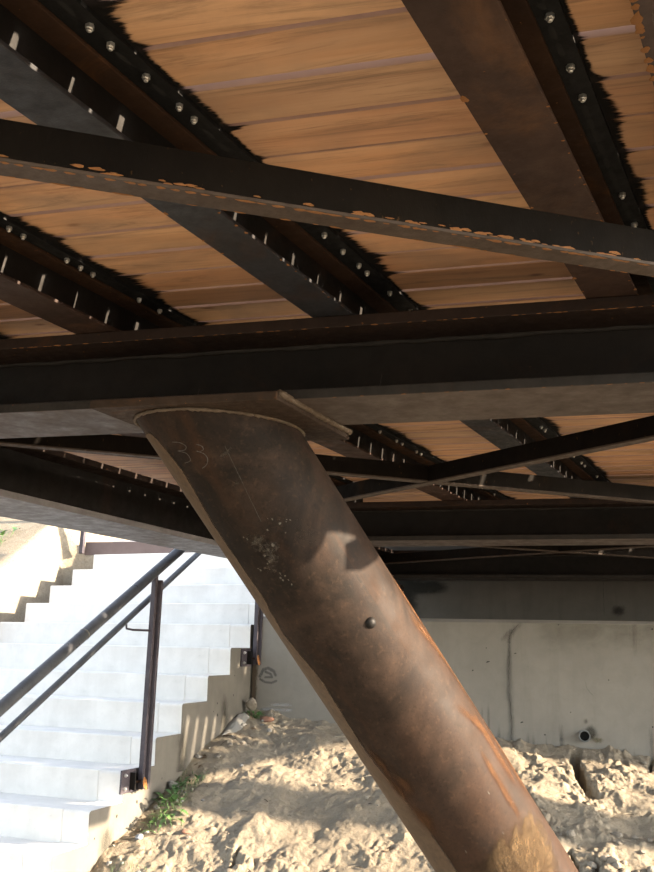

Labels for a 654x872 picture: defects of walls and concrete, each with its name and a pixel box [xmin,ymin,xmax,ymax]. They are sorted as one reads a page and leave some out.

corrosion [0,154,648,295]
corrosion [145,432,457,872]
corrosion [385,565,546,819]